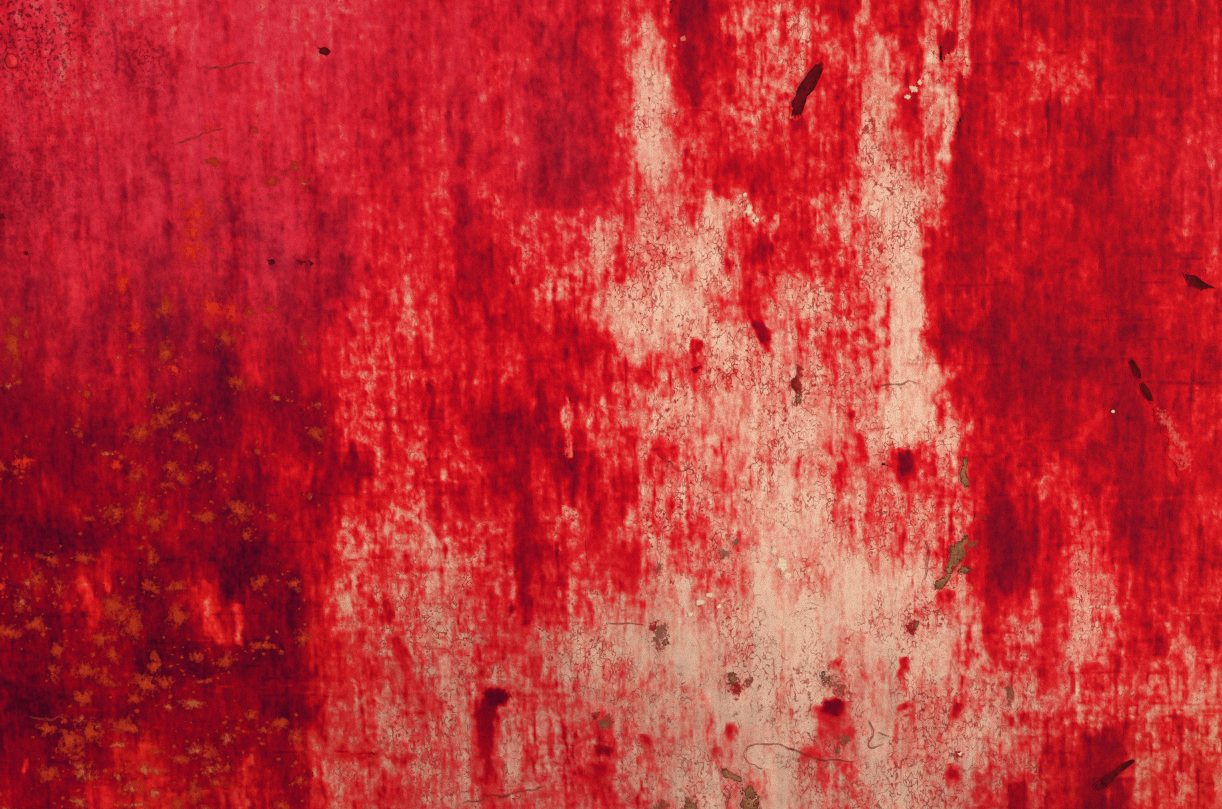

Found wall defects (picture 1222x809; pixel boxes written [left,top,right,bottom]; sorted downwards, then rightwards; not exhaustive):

peeling [0,0,202,148]
peeling [248,0,380,125]
corrosion [0,179,333,809]
peeling [310,0,1222,809]